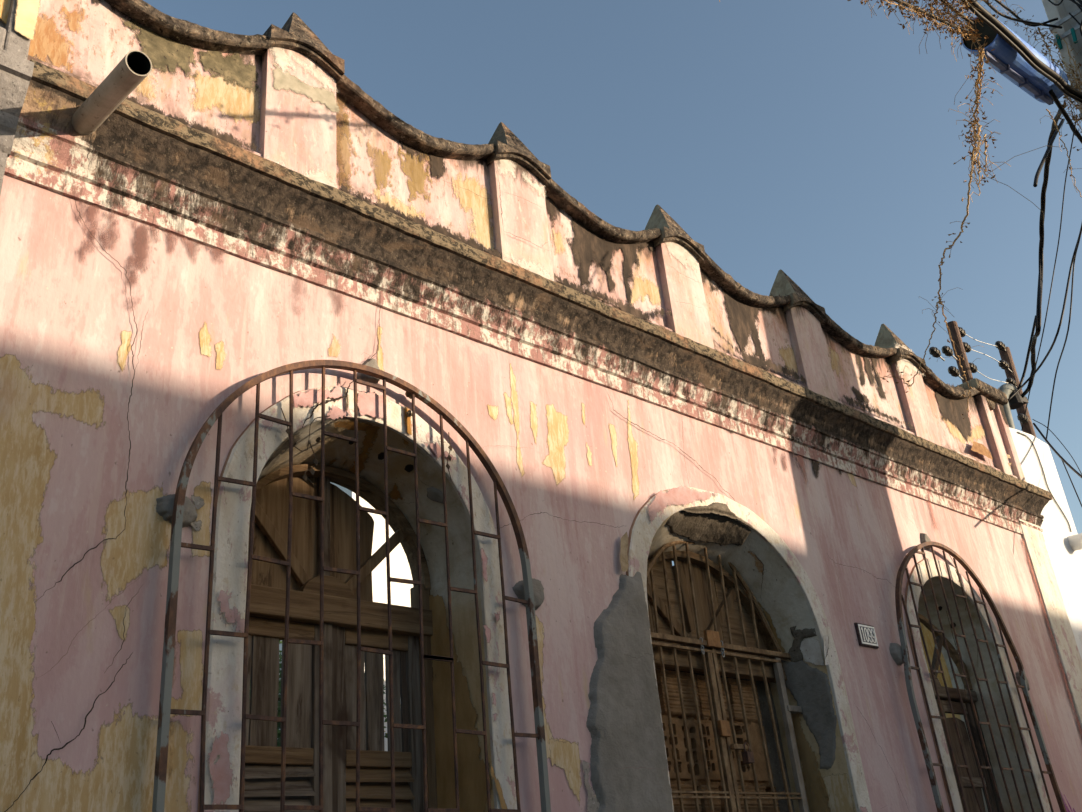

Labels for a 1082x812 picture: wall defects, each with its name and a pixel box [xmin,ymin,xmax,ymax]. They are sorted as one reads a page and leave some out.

peeling [0,0,88,73]
water stain [554,216,672,320]
crack [34,136,148,603]
corrosion [329,390,380,476]
corrosion [403,405,412,445]
water stain [701,269,806,384]
water stain [843,354,914,430]
water stain [935,384,973,441]
peeling [191,481,212,557]
peeling [0,354,204,812]
corrosion [1022,539,1082,738]
crack [4,576,142,812]